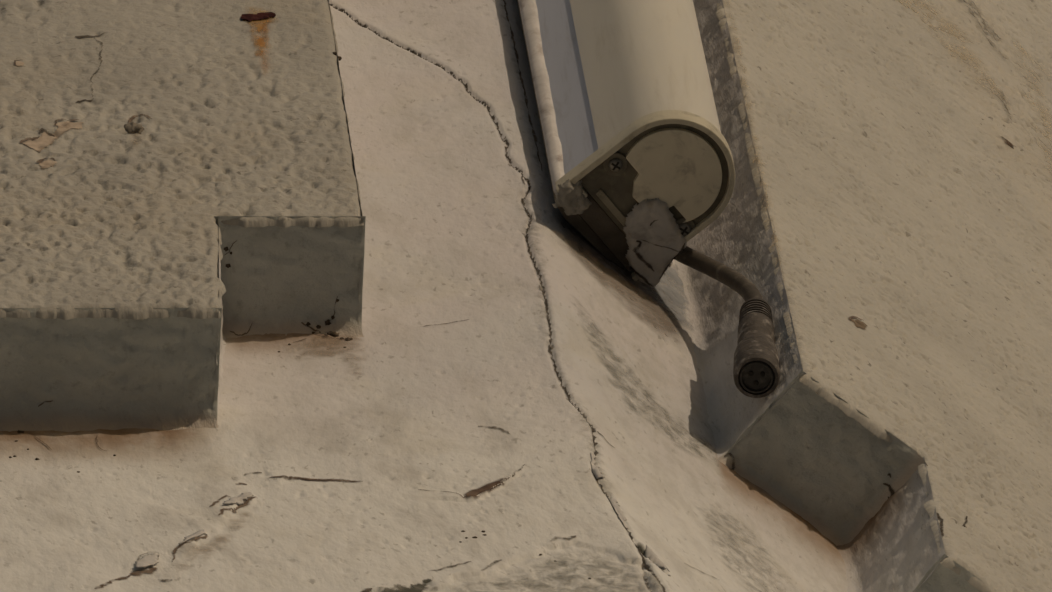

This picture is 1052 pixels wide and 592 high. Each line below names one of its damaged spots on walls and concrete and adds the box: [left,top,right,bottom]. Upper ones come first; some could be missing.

rust [241,10,276,54]
crack [75,33,103,103]
peeling [19,119,84,169]
crack [329,4,666,592]
crack [270,474,359,482]
spalling [362,579,432,592]